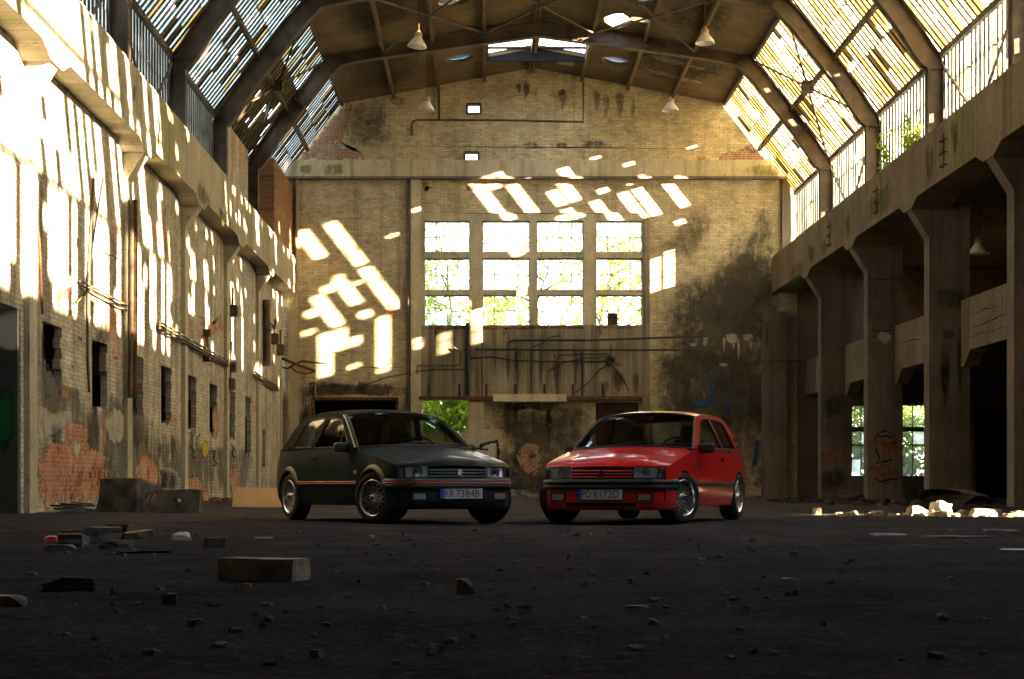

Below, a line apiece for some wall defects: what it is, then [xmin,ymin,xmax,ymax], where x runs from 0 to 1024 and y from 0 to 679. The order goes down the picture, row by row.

leakage [594,92,635,114]
flaking render [301,104,364,160]
flaking render [719,144,766,160]
peeling [719,333,753,366]
peeling [104,406,124,444]
flaking render [37,386,112,509]
flaking render [515,443,544,475]
flaking render [136,453,165,511]